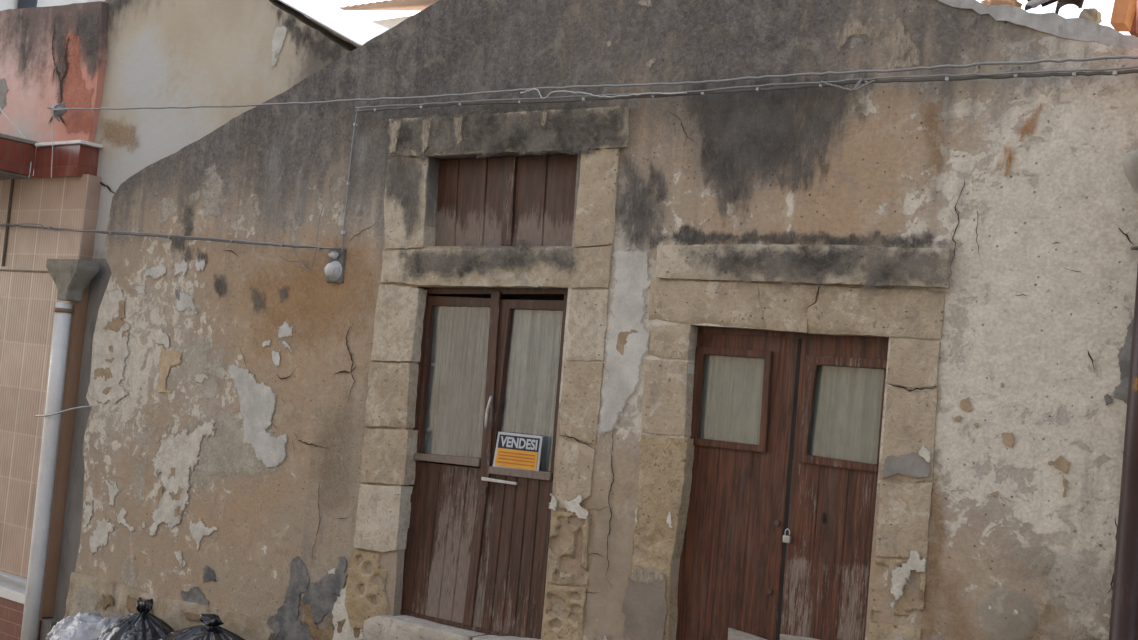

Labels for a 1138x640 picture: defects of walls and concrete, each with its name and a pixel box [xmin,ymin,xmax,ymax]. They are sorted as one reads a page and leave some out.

crack [48,24,69,126]
leakage [52,0,129,104]
leakage [690,73,863,210]
corrosion [1021,105,1042,139]
leakage [385,103,944,289]
crack [950,179,979,282]
peeling [88,259,205,404]
crack [335,327,357,400]
peeling [226,364,287,468]
peeling [83,415,218,554]
crack [560,430,614,593]
spalling [890,550,927,610]